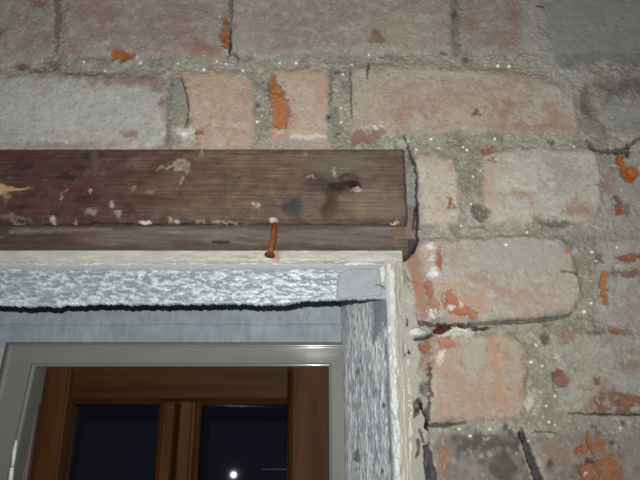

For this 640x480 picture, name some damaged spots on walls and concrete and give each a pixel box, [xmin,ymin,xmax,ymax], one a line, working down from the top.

spalling [102,37,135,63]
spalling [268,75,296,140]
crack [586,138,640,158]
spalling [608,154,639,183]
crack [0,140,419,260]
spalling [424,242,477,320]
spalling [598,254,640,304]
crack [403,314,571,355]
crack [414,363,464,480]
crack [568,410,639,418]
crack [518,428,557,480]
spalling [575,430,624,480]